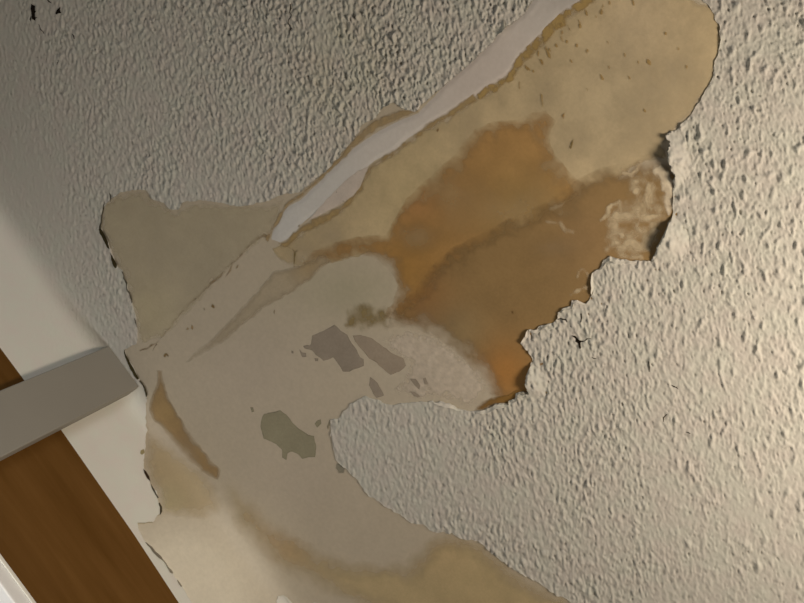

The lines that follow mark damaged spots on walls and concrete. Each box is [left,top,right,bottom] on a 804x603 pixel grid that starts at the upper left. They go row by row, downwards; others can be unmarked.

peeling [618,89,706,179]
water stain [216,0,720,409]
peeling [591,257,637,295]
peeling [102,57,570,603]
water stain [151,380,218,477]
water stain [273,541,555,603]